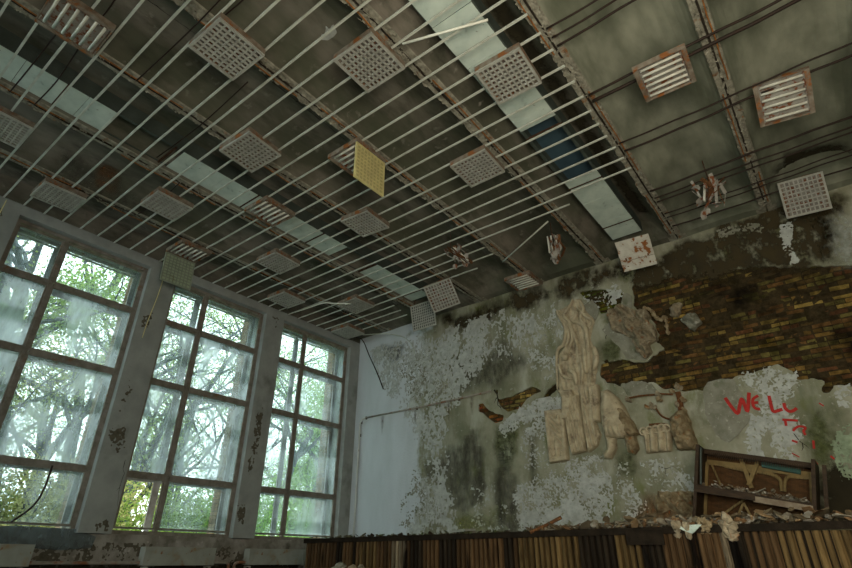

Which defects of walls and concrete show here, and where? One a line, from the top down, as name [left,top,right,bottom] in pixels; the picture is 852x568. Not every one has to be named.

flaking render [581,221,852,461]
damp [426,436,518,533]
peeling [370,300,649,535]
peeling [640,457,694,495]
peeling [830,423,852,480]